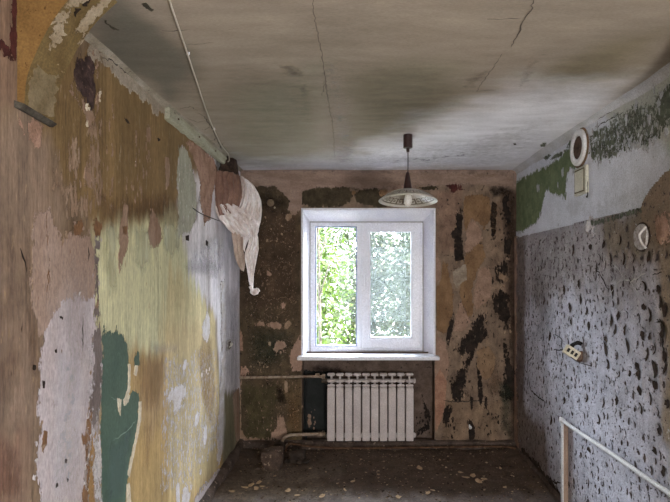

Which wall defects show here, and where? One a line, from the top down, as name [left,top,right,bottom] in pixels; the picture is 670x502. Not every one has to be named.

flaking render [18,64,60,149]
flaking render [49,0,118,51]
crack [312,0,335,153]
crack [477,0,534,92]
peeling [587,84,670,169]
peeling [29,50,142,502]
peeling [165,140,217,241]
spalling [243,139,670,502]
leakage [450,208,464,263]
leakage [490,187,512,259]
peeling [160,279,303,502]
leakage [467,353,509,433]